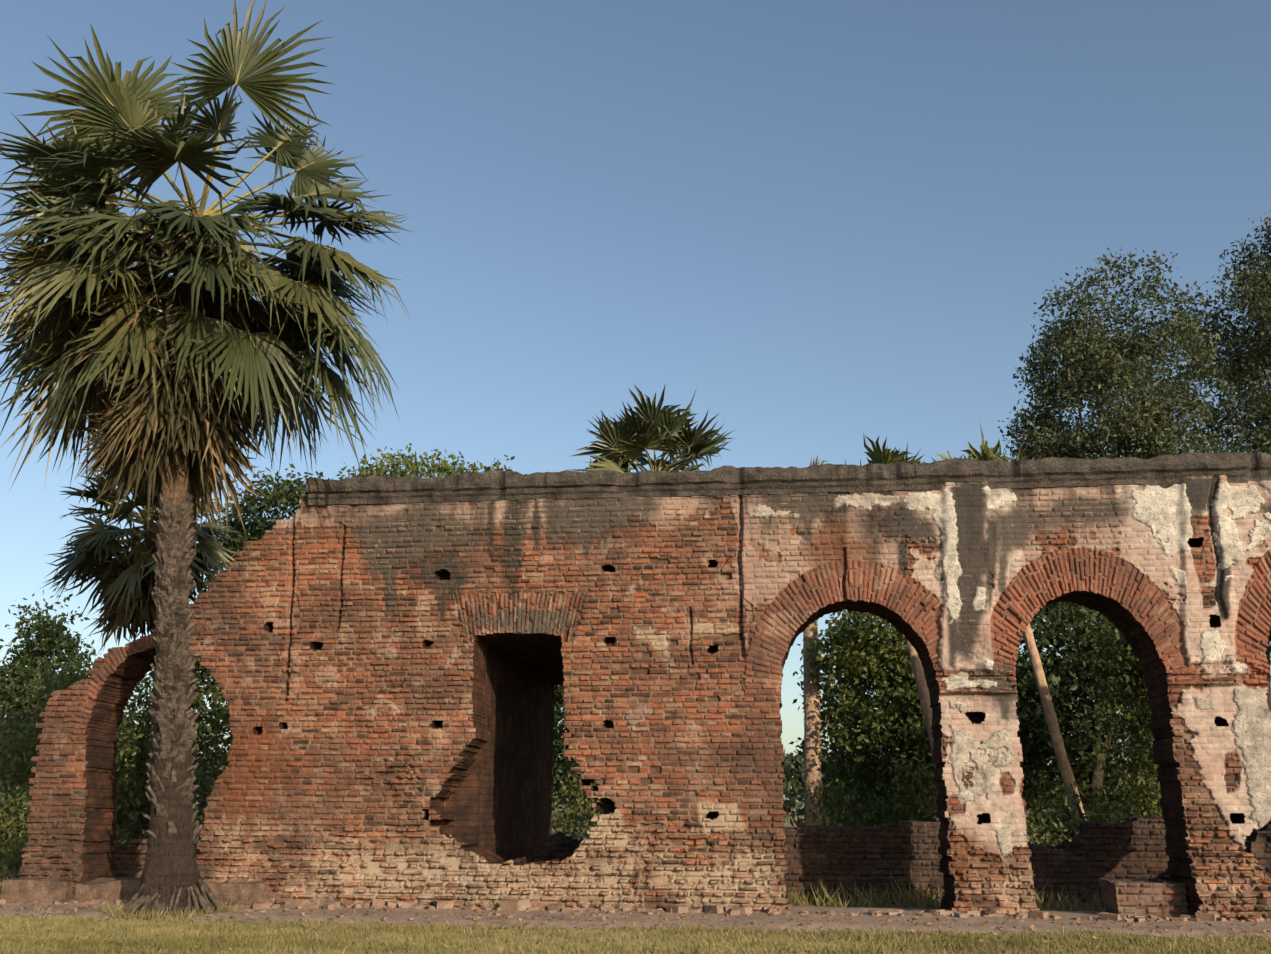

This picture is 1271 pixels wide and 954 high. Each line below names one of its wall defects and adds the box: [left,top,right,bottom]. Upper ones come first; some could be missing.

crack [278,513,301,700]
crack [720,497,754,653]
peeling [834,489,986,624]
peeling [982,486,1018,511]
peeling [1131,480,1271,827]
peeling [942,659,1015,856]